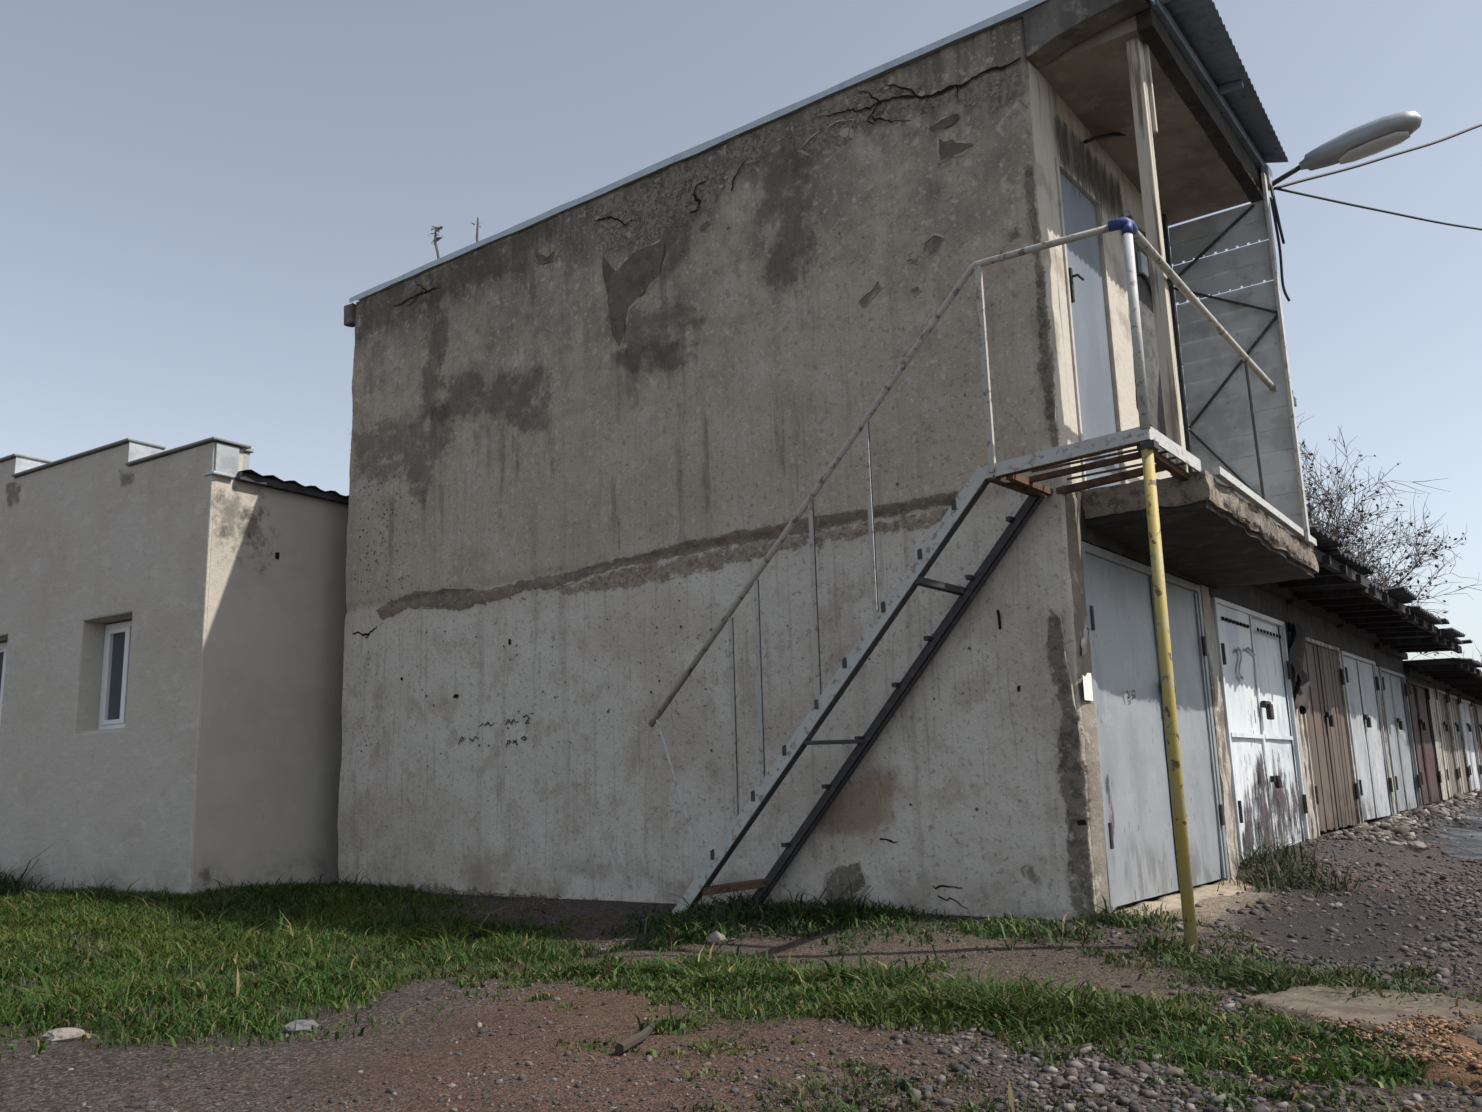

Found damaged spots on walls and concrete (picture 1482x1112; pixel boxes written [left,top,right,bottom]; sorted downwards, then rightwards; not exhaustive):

crack [812,57,1021,124]
spalling [592,70,1024,353]
spalling [354,469,958,624]
spalling [824,860,872,904]